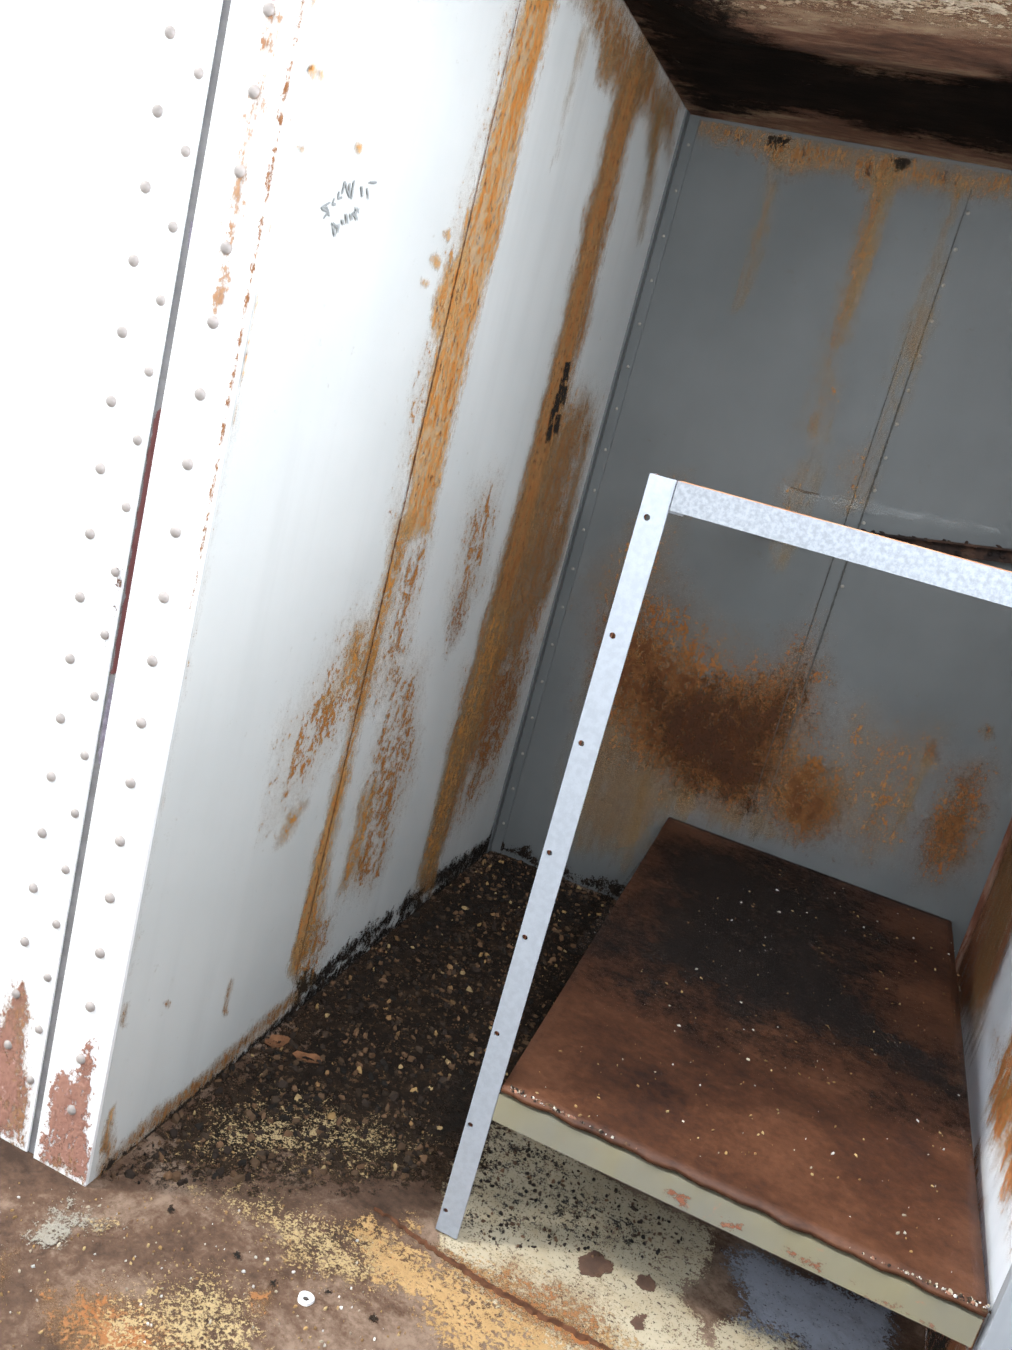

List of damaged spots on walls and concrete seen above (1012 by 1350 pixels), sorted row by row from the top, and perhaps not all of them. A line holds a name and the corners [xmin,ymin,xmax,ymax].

corrosion [99,0,680,1350]
corrosion [848,721,1012,1027]
peeling [0,980,98,1185]
corrosion [664,1189,690,1210]
corrosion [974,1034,1012,1230]
corrosion [38,1259,290,1350]
corrosion [865,1296,984,1350]